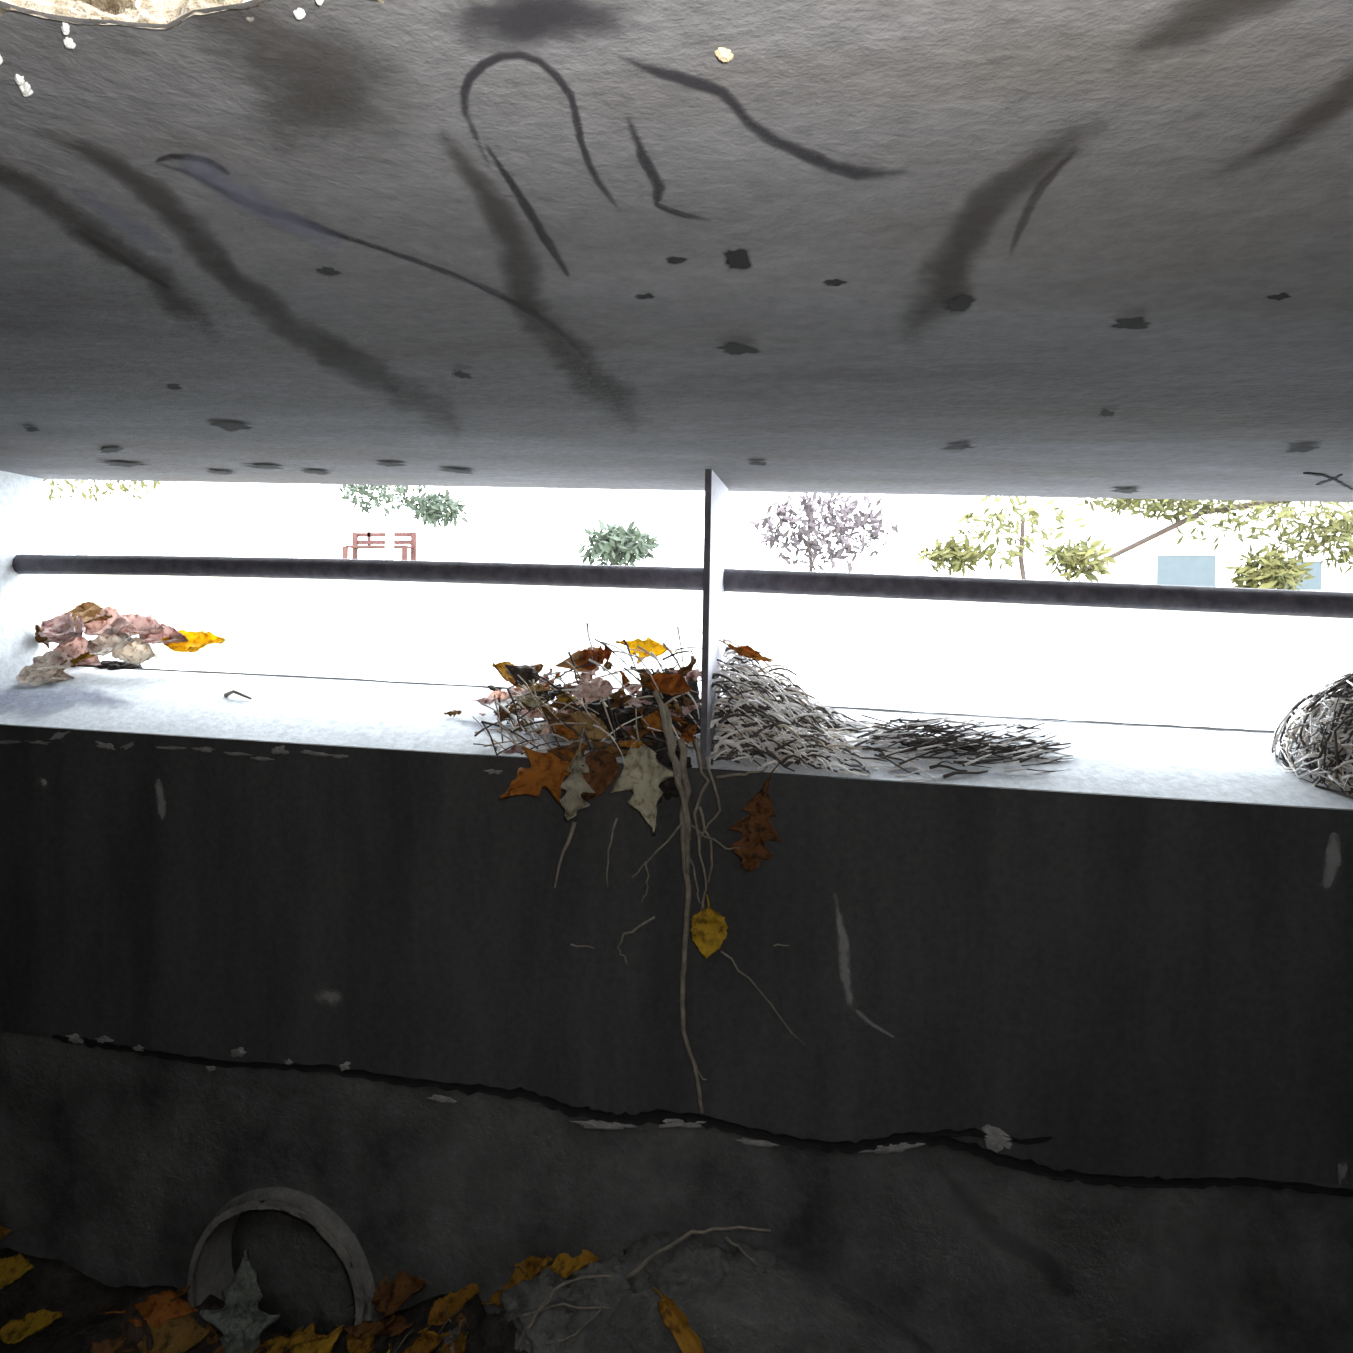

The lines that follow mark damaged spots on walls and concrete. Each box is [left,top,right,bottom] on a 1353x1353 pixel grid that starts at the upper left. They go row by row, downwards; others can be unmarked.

damp [14,74,33,97]
damp [61,22,76,49]
damp [0,168,191,314]
spalling [0,0,267,29]
damp [84,149,399,392]
damp [293,0,324,20]
damp [157,151,621,399]
damp [462,0,612,199]
damp [631,125,700,218]
damp [632,61,886,179]
damp [923,148,1064,313]
crack [51,1034,1353,1197]